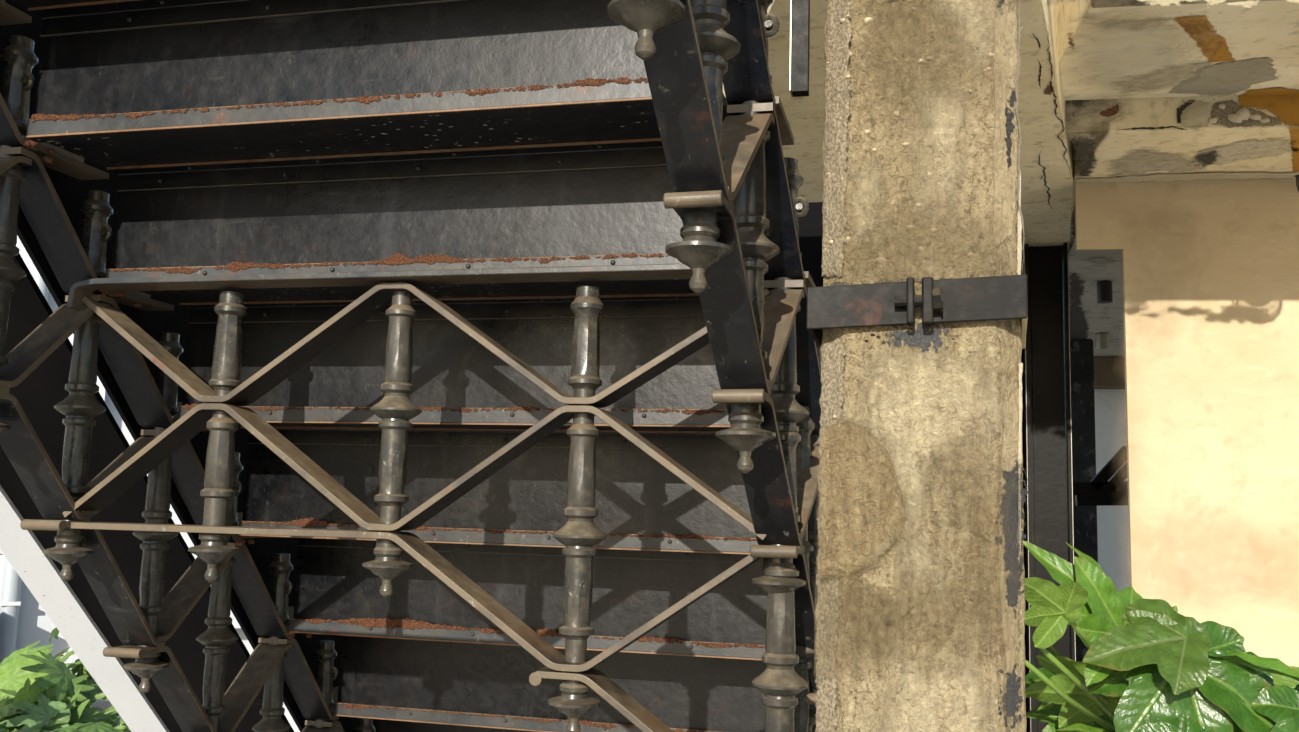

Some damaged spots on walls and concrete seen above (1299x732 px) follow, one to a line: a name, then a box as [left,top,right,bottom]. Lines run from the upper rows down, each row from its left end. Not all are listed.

peeling [1138,0,1259,8]
peeling [994,88,1022,275]
crack [1015,0,1071,270]
peeling [1073,99,1299,183]
peeling [995,363,1029,619]
peeling [998,664,1023,729]